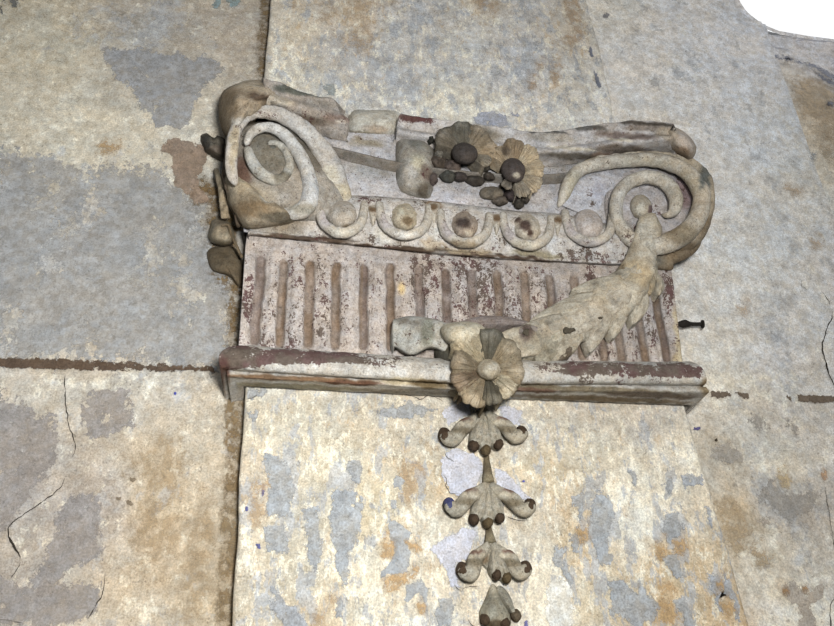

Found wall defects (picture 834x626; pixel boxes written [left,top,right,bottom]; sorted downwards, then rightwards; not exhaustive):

damp [194,175,239,248]
damp [211,271,243,346]
crack [822,293,834,385]
crack [64,379,76,457]
peeling [440,448,483,496]
peeling [494,468,532,500]
crack [8,476,66,578]
peeling [262,453,364,618]
peeling [380,519,411,578]
peeling [430,527,477,588]
peeling [435,597,454,626]
peeling [785,580,824,626]